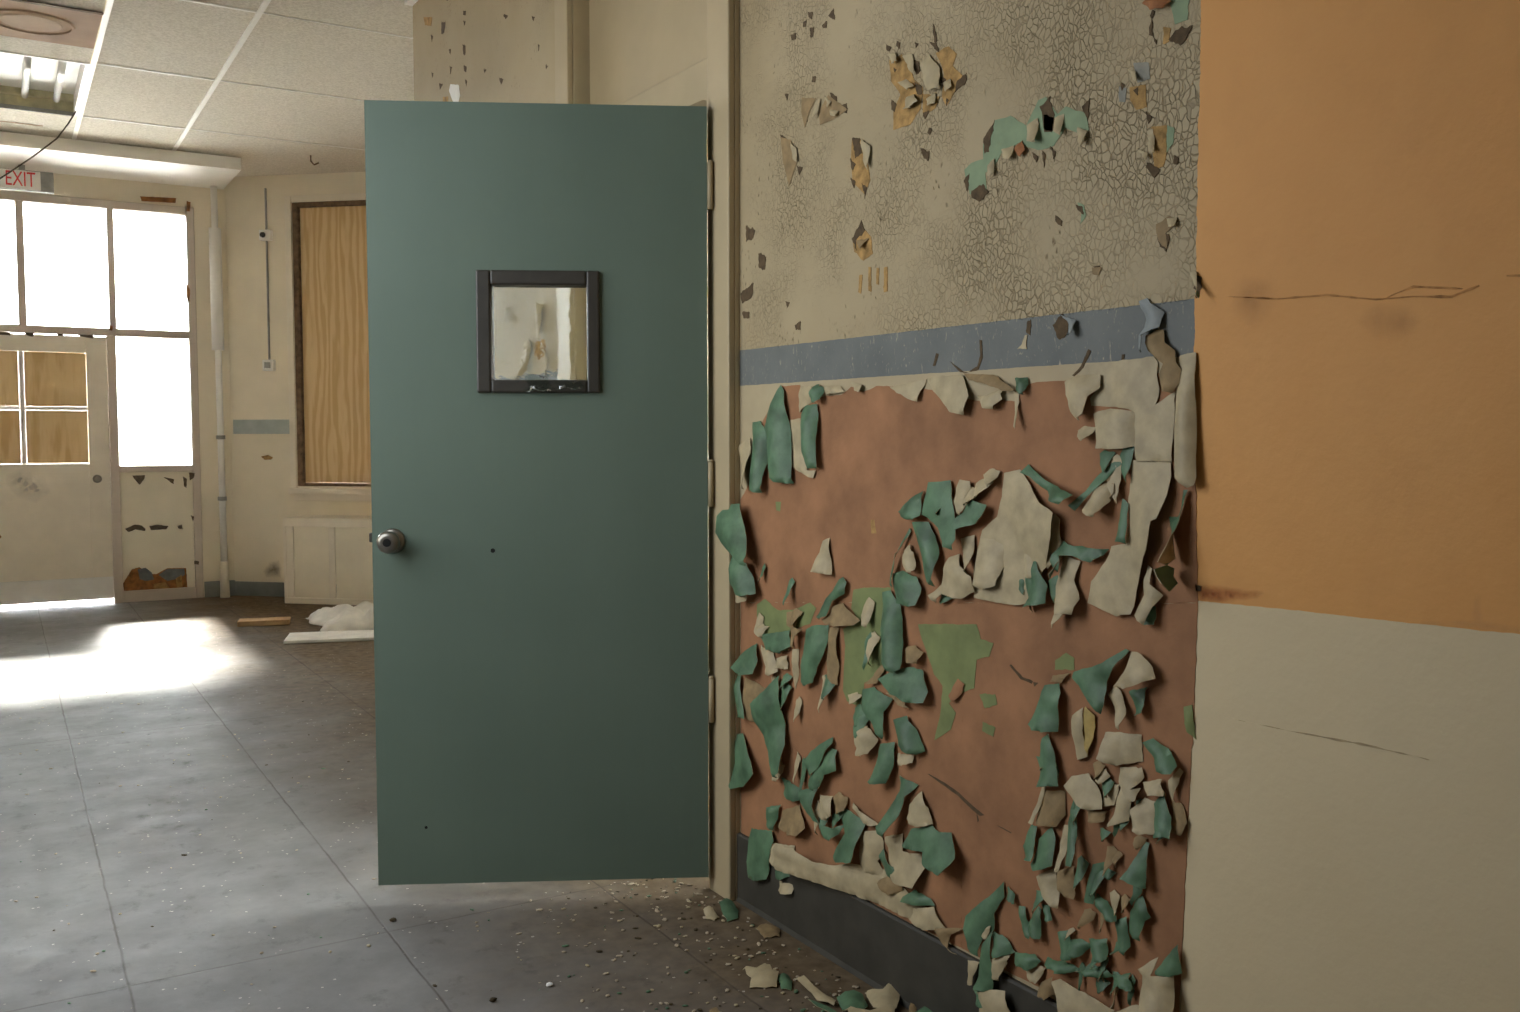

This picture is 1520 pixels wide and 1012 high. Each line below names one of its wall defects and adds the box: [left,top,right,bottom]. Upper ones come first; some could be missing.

spalling [423,17,503,102]
spalling [850,137,870,195]
spalling [886,24,967,161]
spalling [964,97,1090,202]
spalling [1118,62,1179,178]
spalling [1142,0,1193,46]
spalling [740,225,766,319]
spalling [852,220,888,293]
crack [1228,274,1520,300]
spalling [126,515,194,532]
peeling [715,298,1198,1012]
crack [1235,719,1429,760]